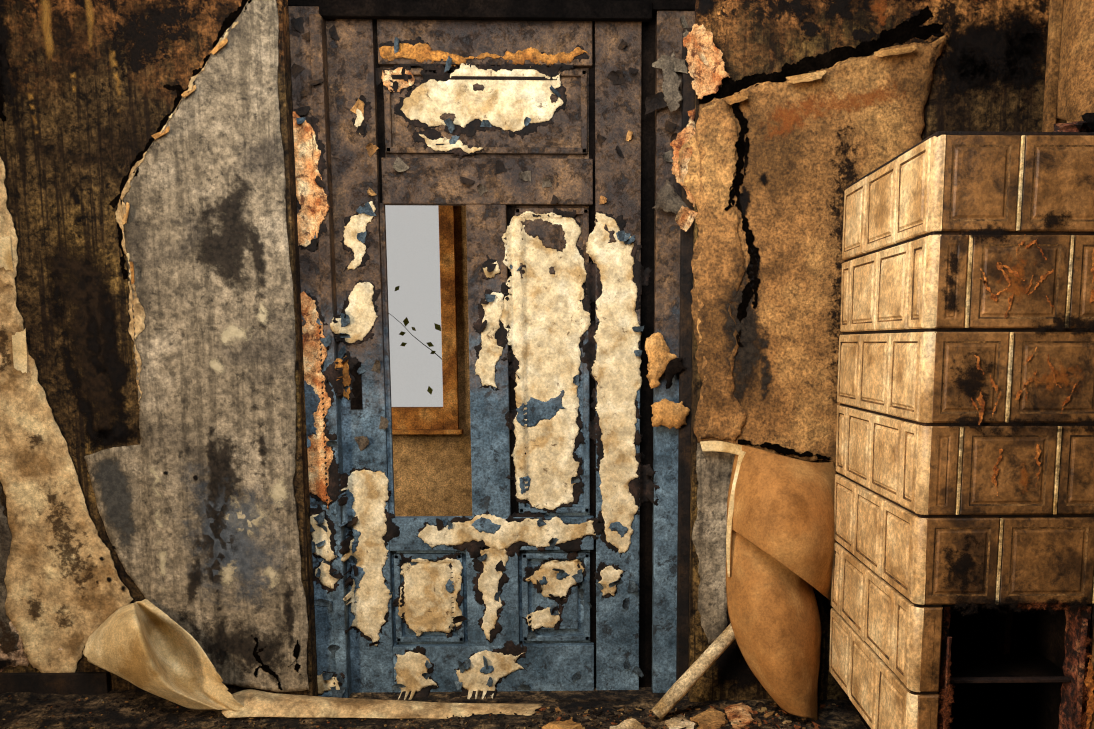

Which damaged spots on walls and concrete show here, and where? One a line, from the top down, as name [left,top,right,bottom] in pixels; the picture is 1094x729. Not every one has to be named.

water stain [43,0,53,52]
water stain [109,0,207,91]
peeling [293,106,330,247]
peeling [350,95,378,158]
peeling [393,157,409,172]
peeling [375,37,590,154]
peeling [597,130,633,158]
peeling [652,24,730,232]
crack [696,5,945,347]
water stain [778,0,880,42]
peeling [301,188,690,700]
spalling [0,484,35,673]